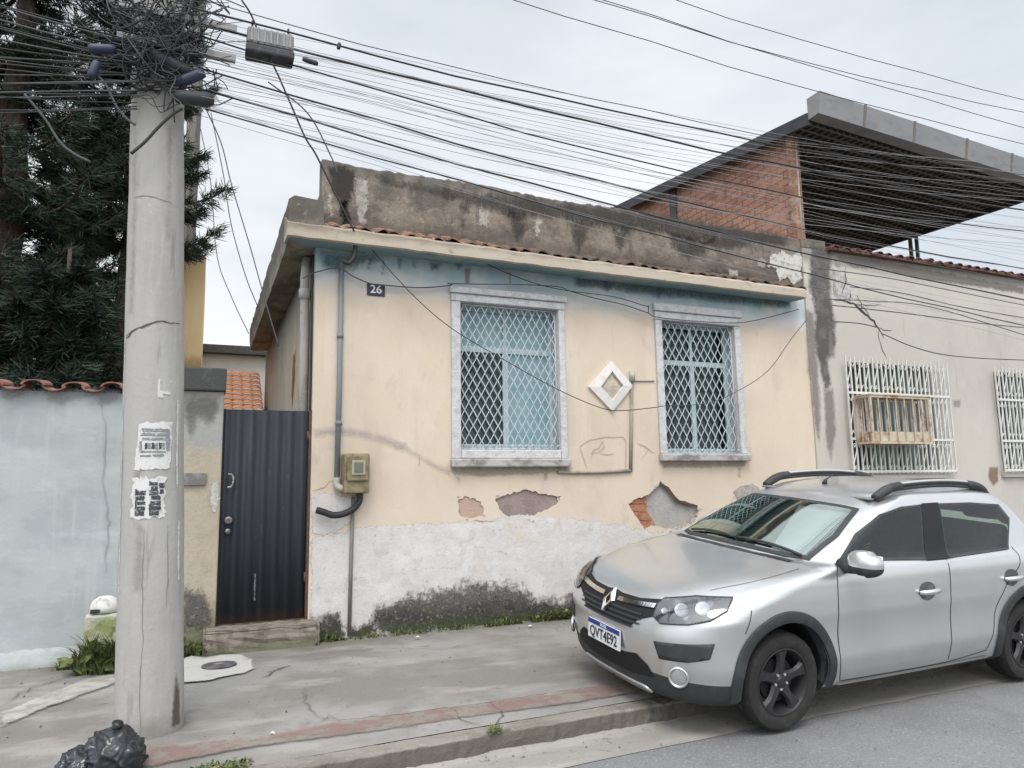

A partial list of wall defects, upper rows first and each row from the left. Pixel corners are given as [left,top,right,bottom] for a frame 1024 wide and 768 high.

damp [329,166,355,225]
damp [383,179,786,256]
peeling [757,251,803,284]
crack [126,321,180,338]
damp [807,248,1023,450]
peeling [310,482,759,638]
damp [318,581,572,639]